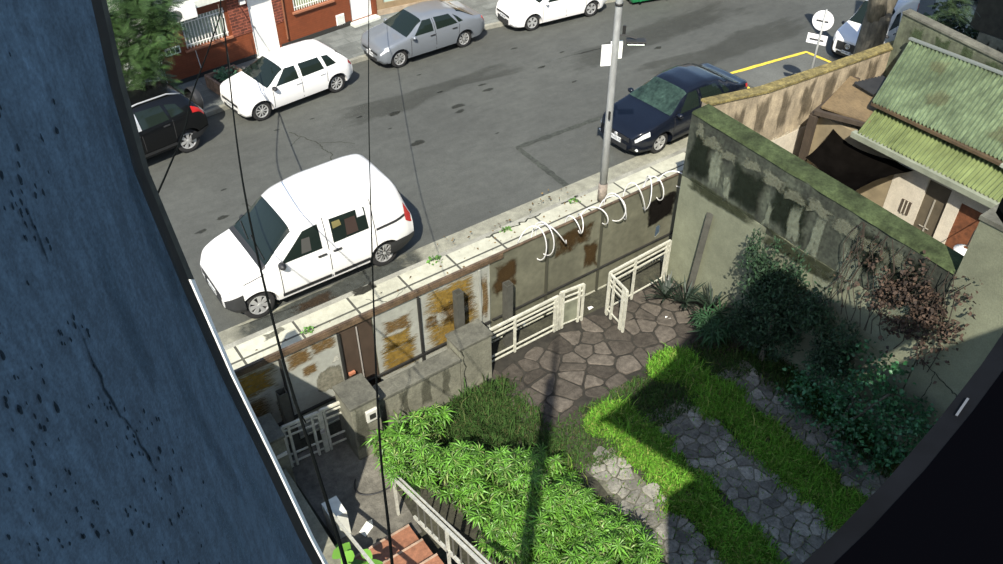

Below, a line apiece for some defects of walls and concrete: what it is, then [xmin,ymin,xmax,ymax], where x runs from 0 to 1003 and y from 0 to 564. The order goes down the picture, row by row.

corrosion [555,222,598,267]
corrosion [382,315,419,375]
corrosion [426,260,516,346]
crack [84,340,152,463]